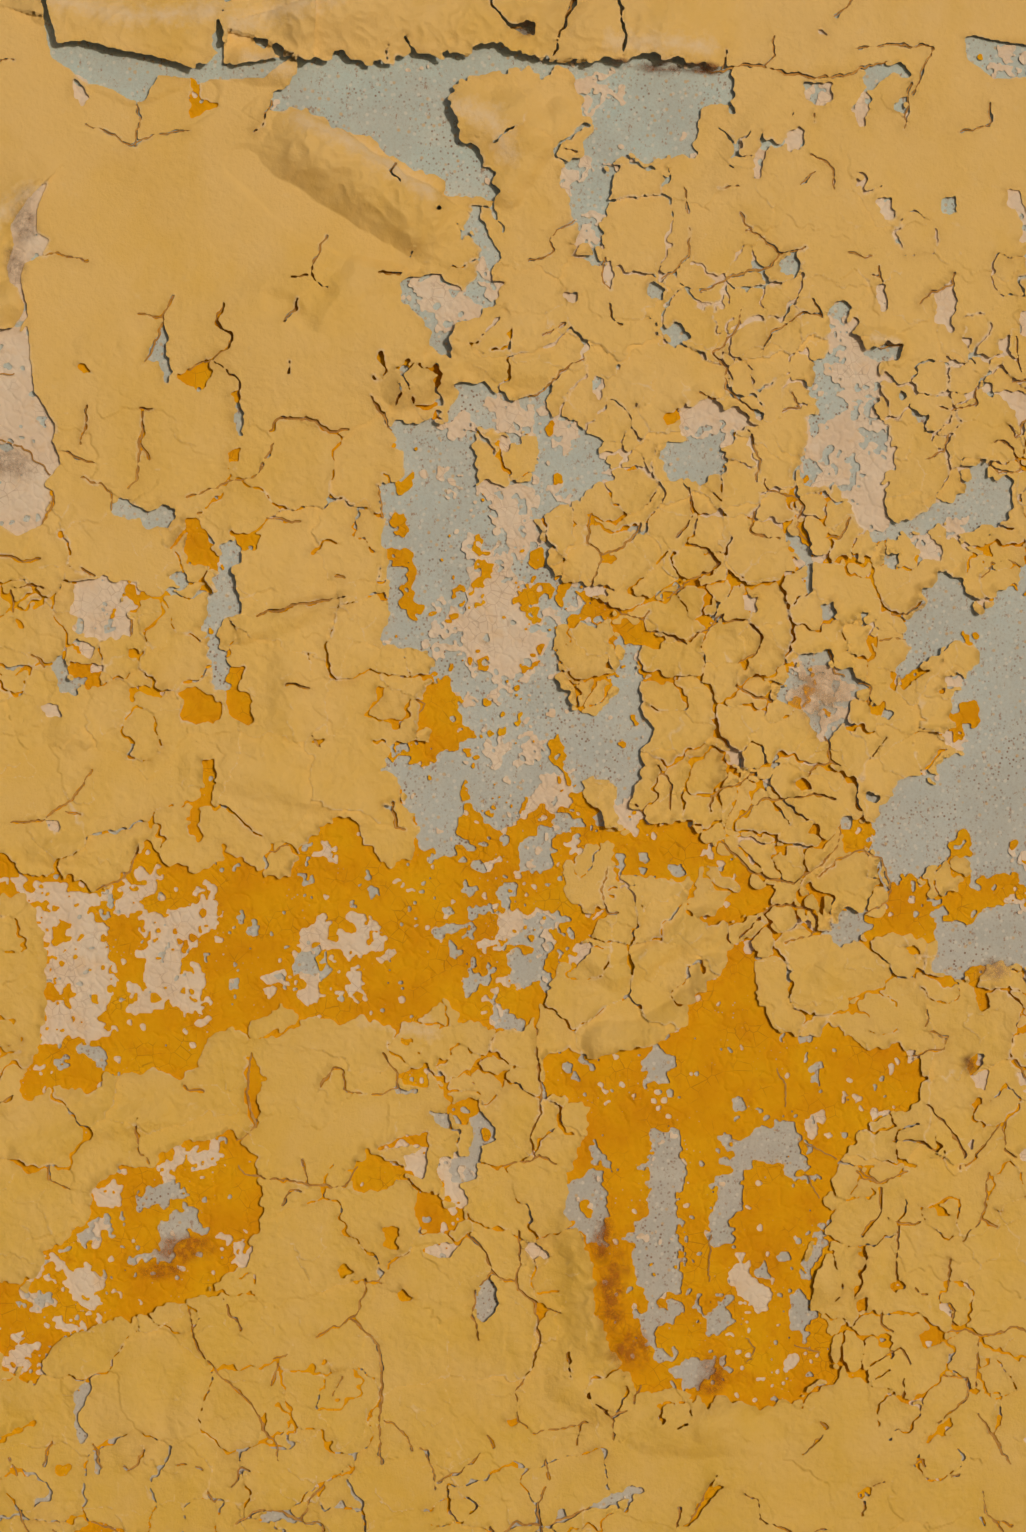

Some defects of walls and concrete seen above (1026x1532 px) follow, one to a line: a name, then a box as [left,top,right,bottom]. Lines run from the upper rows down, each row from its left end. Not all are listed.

peeling [39,0,783,365]
peeling [725,75,835,189]
peeling [851,44,934,129]
peeling [965,35,1026,79]
peeling [0,178,301,725]
peeling [0,273,1026,1477]
crack [502,1029,557,1167]
crack [926,1104,998,1242]
crack [467,1230,562,1367]
crack [188,1309,279,1461]
crack [315,1278,413,1465]
crack [937,1326,1026,1464]